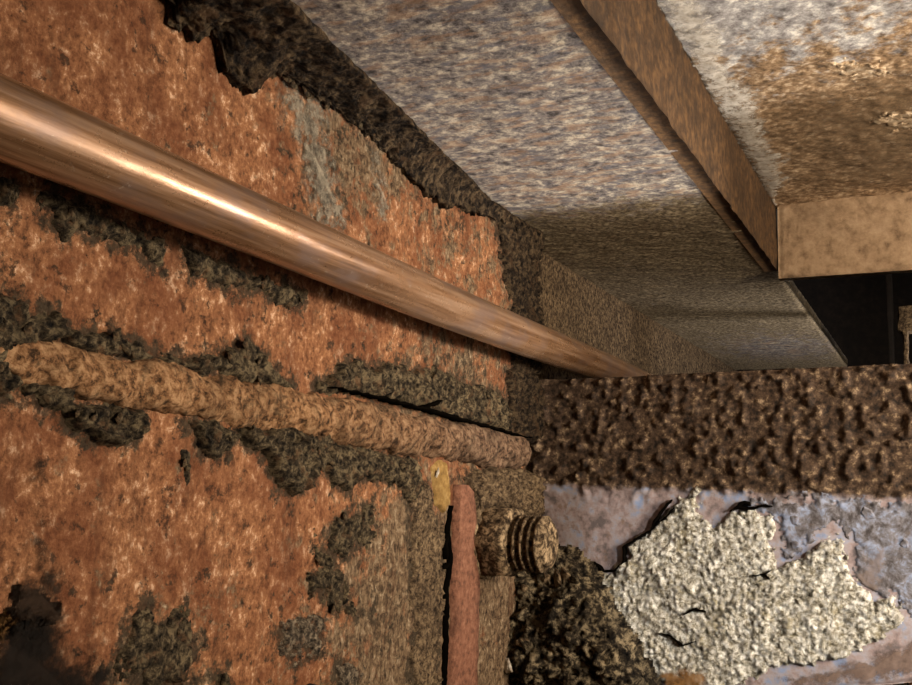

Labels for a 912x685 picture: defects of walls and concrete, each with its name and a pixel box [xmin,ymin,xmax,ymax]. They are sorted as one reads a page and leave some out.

crack [330,387,533,438]
peeling [430,460,451,513]
rust [0,570,112,685]